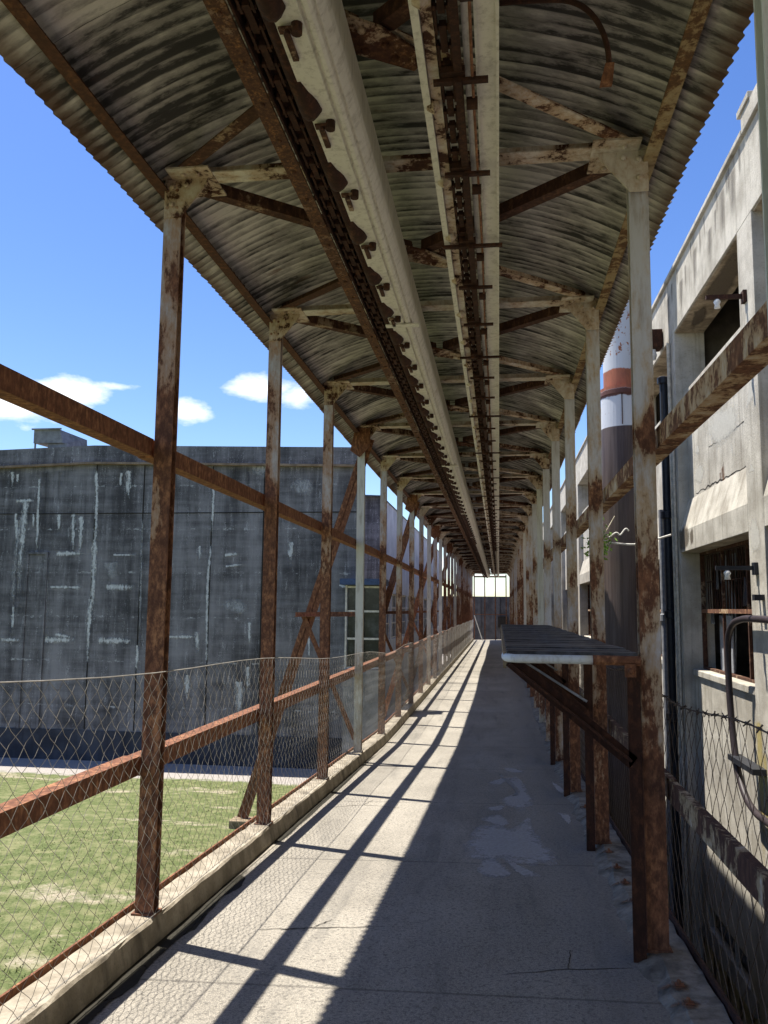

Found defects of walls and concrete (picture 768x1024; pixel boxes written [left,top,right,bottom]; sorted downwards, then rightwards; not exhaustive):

water stain [13,479,40,573]
water stain [45,473,141,668]